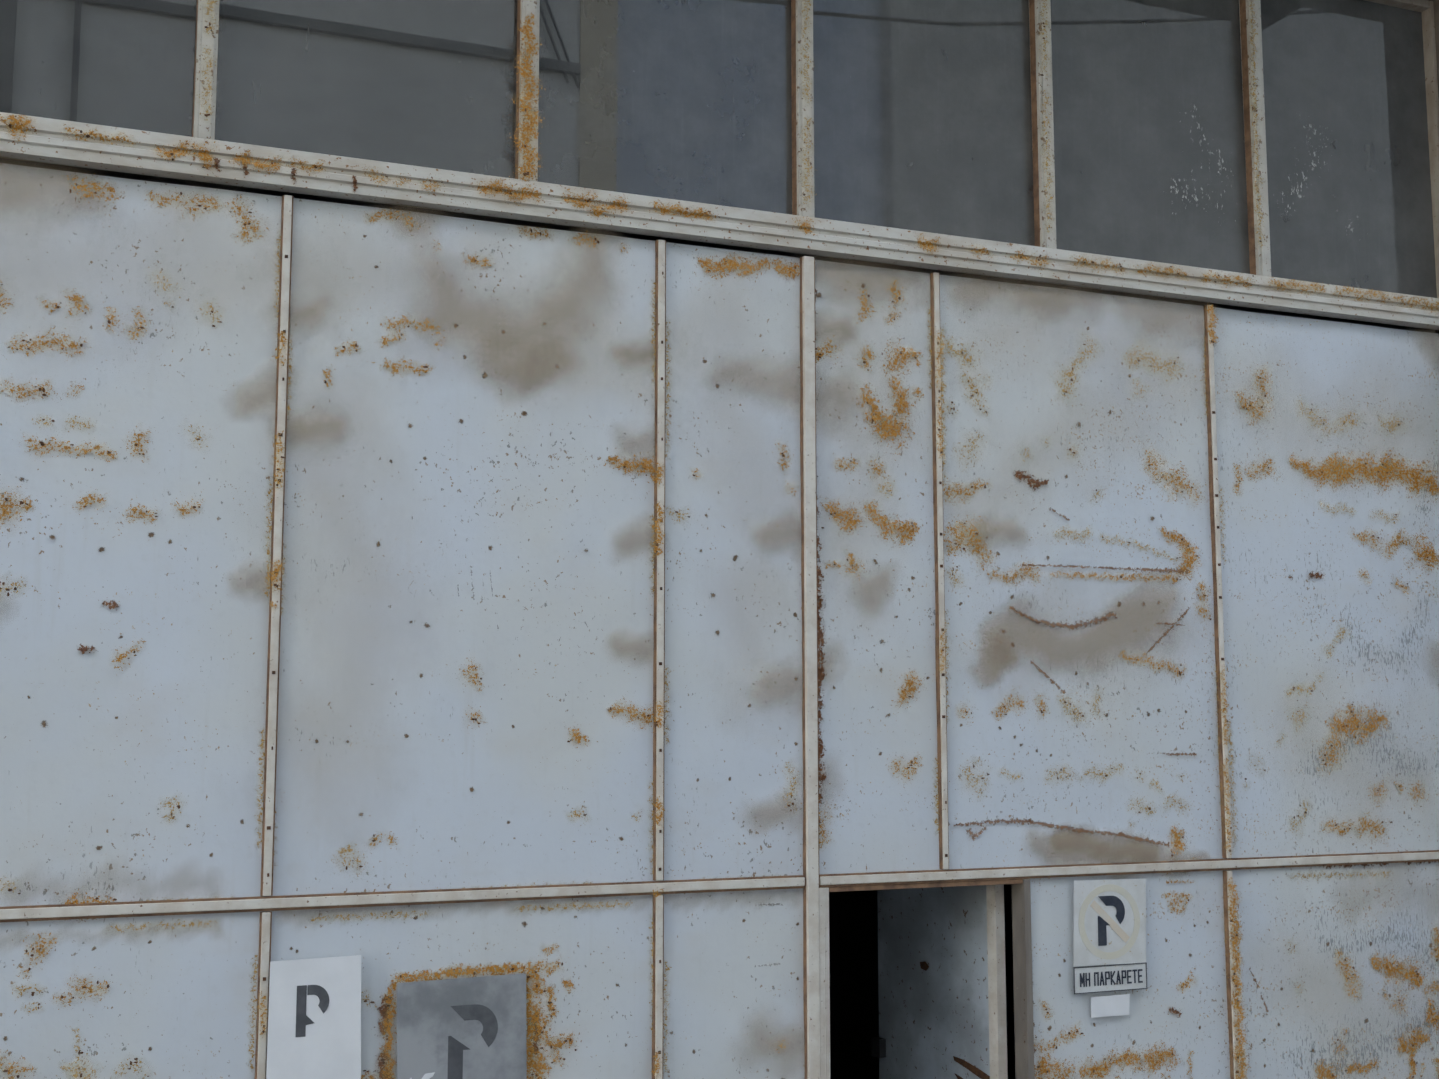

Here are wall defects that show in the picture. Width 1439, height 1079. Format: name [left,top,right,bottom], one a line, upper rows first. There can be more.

corrosion [63,127,323,184]
corrosion [477,13,633,248]
corrosion [145,187,297,615]
corrosion [1072,254,1439,415]
corrosion [122,499,203,544]
corrosion [815,279,1214,848]
leakage [1147,607,1191,652]
corrosion [1140,395,1439,596]
corrosion [1317,701,1391,777]
corrosion [879,664,1266,1079]
corrosion [12,933,113,1014]
corrosion [361,944,577,1079]